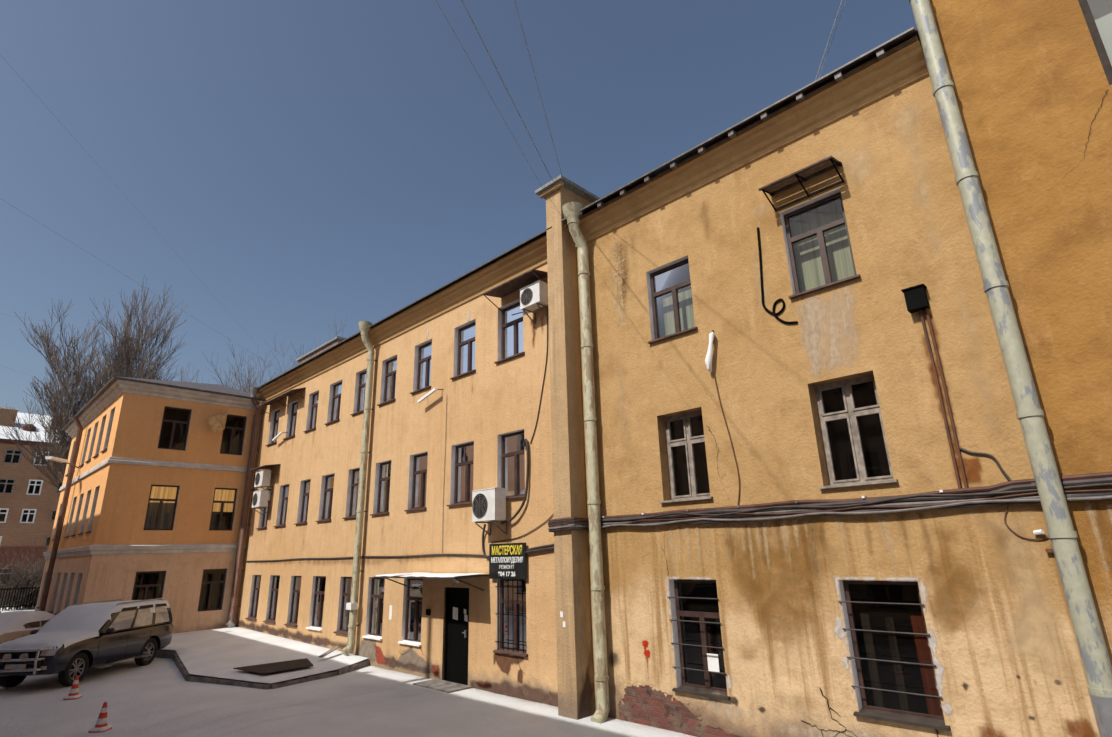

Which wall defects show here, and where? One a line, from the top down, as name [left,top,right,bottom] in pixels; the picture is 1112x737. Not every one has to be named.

crack [1066,89,1109,175]
rust [924,315,981,482]
flaking render [618,675,747,737]
peeling [666,577,712,615]
leakage [735,527,817,632]
crack [801,687,857,737]
peeling [834,576,926,696]
peeling [929,629,952,715]
leakage [935,537,974,628]